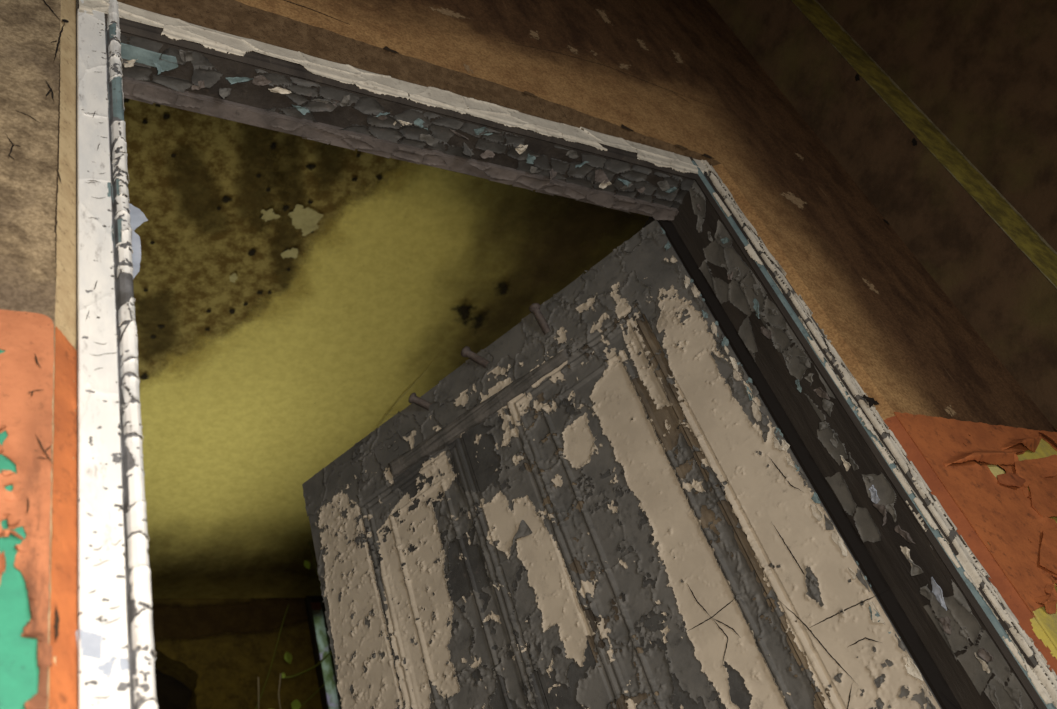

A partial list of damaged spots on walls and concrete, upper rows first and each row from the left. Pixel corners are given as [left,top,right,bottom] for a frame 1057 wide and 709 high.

peeling [120,43,194,75]
peeling [219,75,350,115]
peeling [515,144,557,180]
peeling [566,150,645,193]
water stain [124,98,417,380]
peeling [261,204,323,236]
peeling [664,242,762,422]
peeling [751,283,951,635]
peeling [0,425,53,709]
peeling [512,520,533,547]
peeling [943,431,1057,649]
peeling [895,634,936,709]